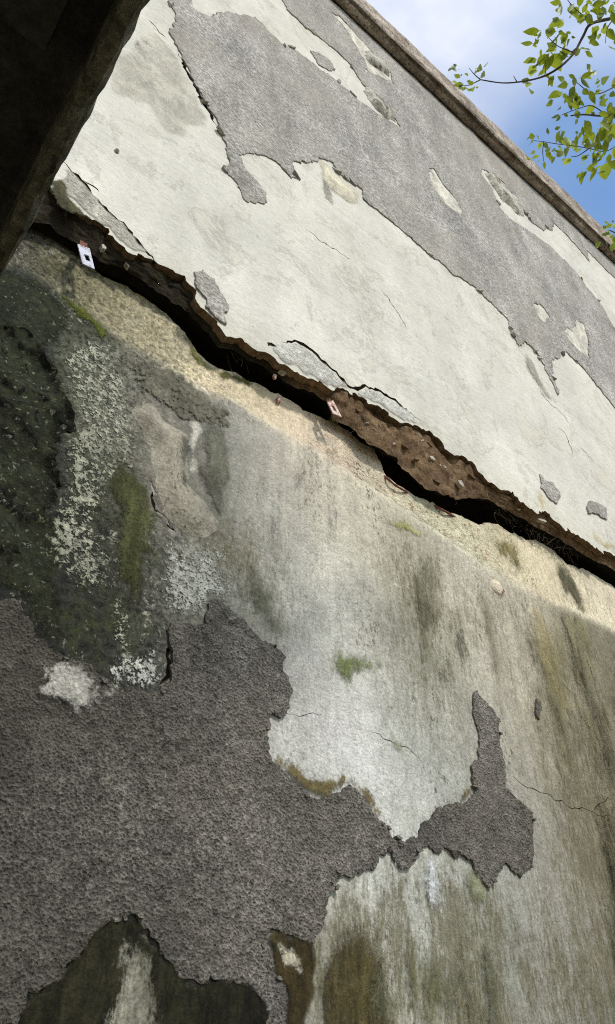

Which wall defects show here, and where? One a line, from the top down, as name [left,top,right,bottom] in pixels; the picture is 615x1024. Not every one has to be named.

crack [64,162,156,264]
peeling [116,0,615,408]
spalling [34,170,615,571]
crack [267,339,416,418]
spalling [0,326,76,565]
crack [150,481,176,532]
peeling [0,598,537,1024]
crack [508,773,613,818]
leakage [107,939,155,1024]
leakage [322,913,392,1024]